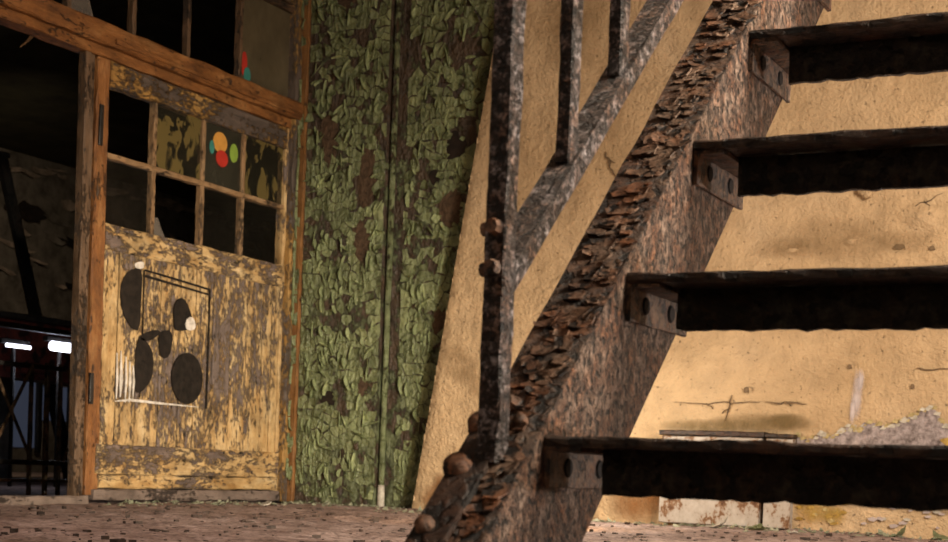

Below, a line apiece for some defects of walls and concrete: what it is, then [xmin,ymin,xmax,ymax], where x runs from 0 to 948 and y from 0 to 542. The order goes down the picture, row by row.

flaking render [795,405,948,446]